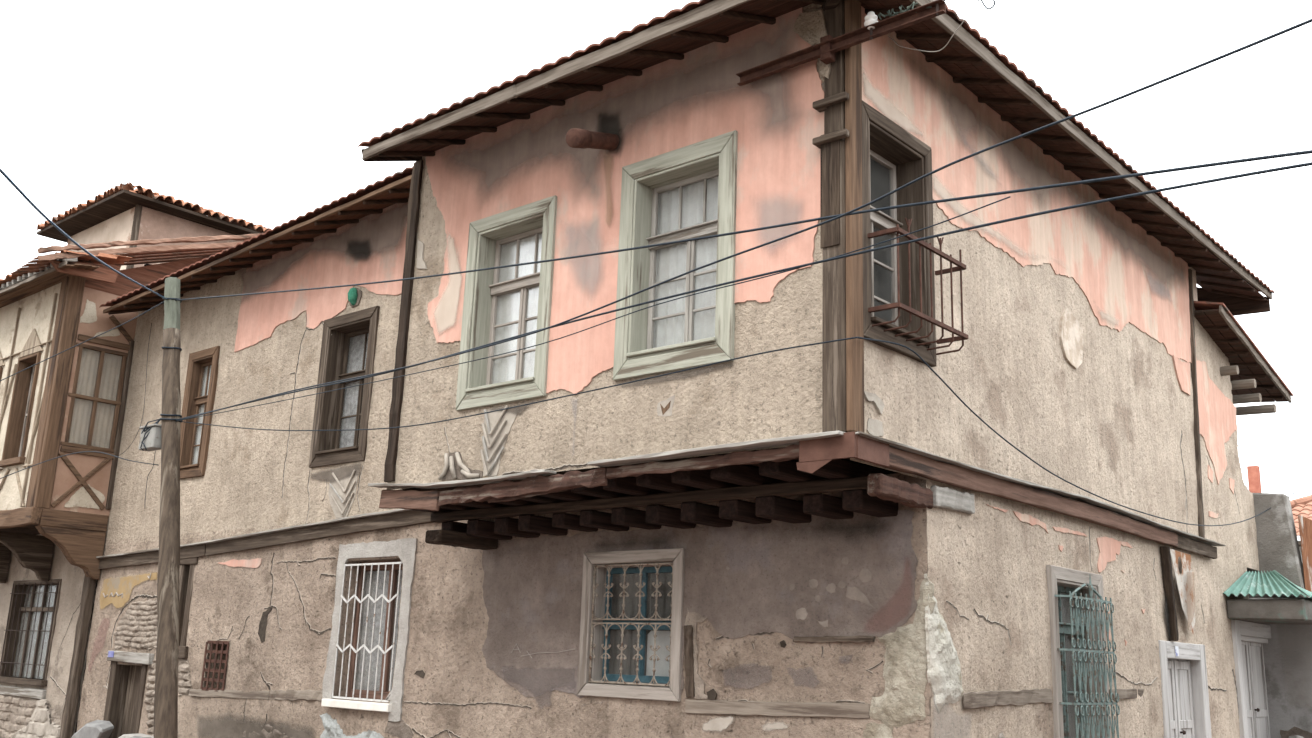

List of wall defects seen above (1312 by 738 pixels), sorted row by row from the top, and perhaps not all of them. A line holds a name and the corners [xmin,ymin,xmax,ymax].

peeling [234,198,427,352]
peeling [426,7,831,394]
peeling [861,6,1237,494]
crack [282,313,363,524]
flaking render [113,599,158,736]
crack [210,552,336,641]
spalling [385,719,413,738]